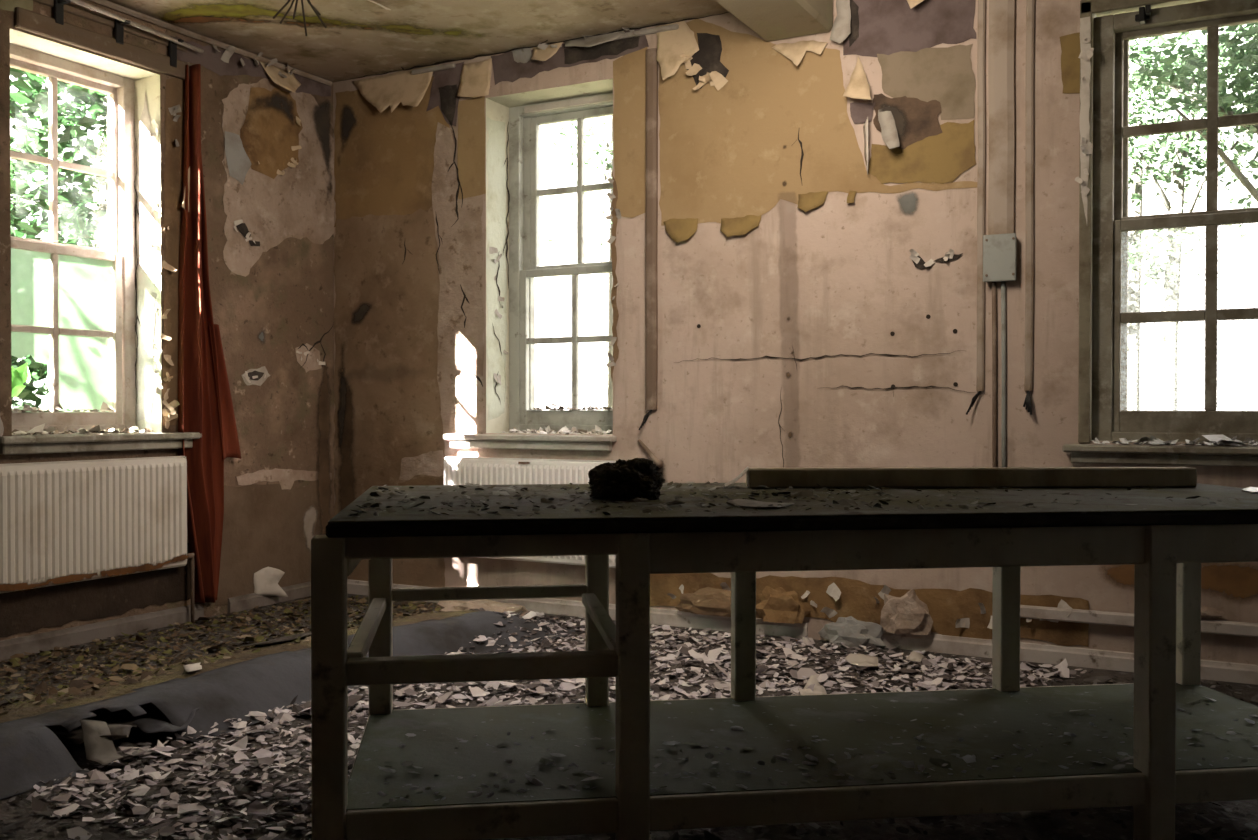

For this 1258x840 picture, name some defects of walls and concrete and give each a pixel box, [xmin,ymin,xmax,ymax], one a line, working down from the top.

peeling [175,36,334,277]
crack [402,127,470,328]
peeling [426,62,509,434]
spalling [680,33,729,90]
peeling [830,0,976,184]
spalling [215,468,332,606]
peeling [398,450,444,486]
crack [681,346,974,468]